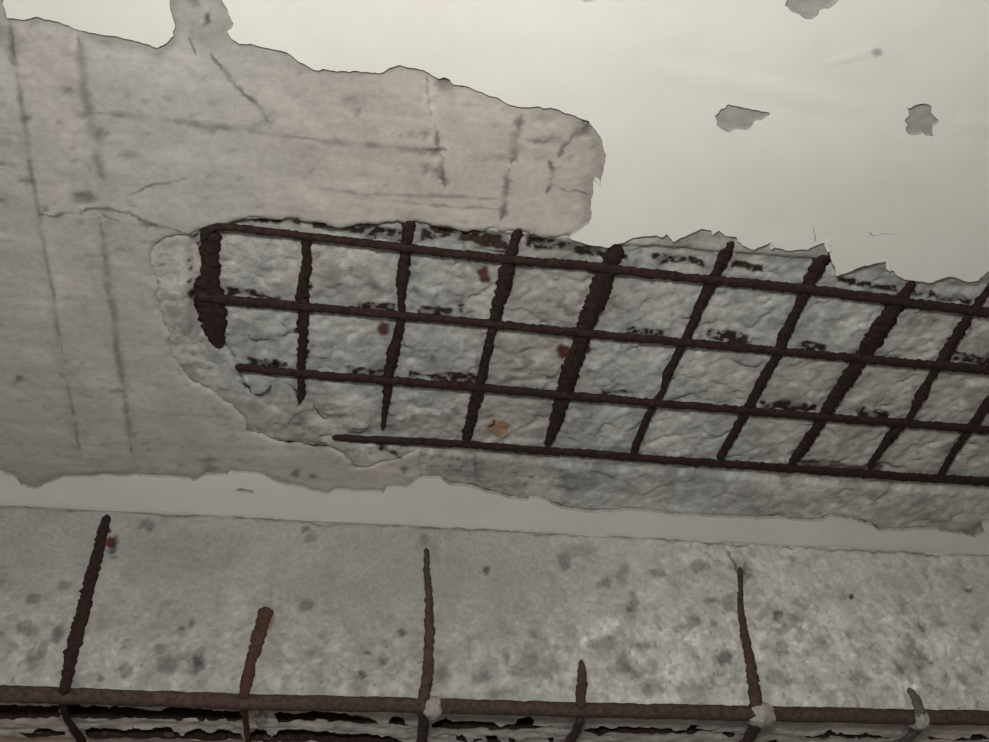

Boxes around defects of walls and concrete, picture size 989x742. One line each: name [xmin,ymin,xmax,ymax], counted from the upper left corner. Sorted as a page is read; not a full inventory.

rust [313,222,402,242]
rust [421,225,508,249]
rust [526,234,604,257]
rust [477,267,489,282]
flaking render [0,0,989,535]
rust [652,253,704,267]
rust [732,260,763,271]
rust [838,277,897,291]
rust [707,329,748,344]
rust [409,371,477,383]
rust [760,400,816,412]
spalling [0,506,989,742]